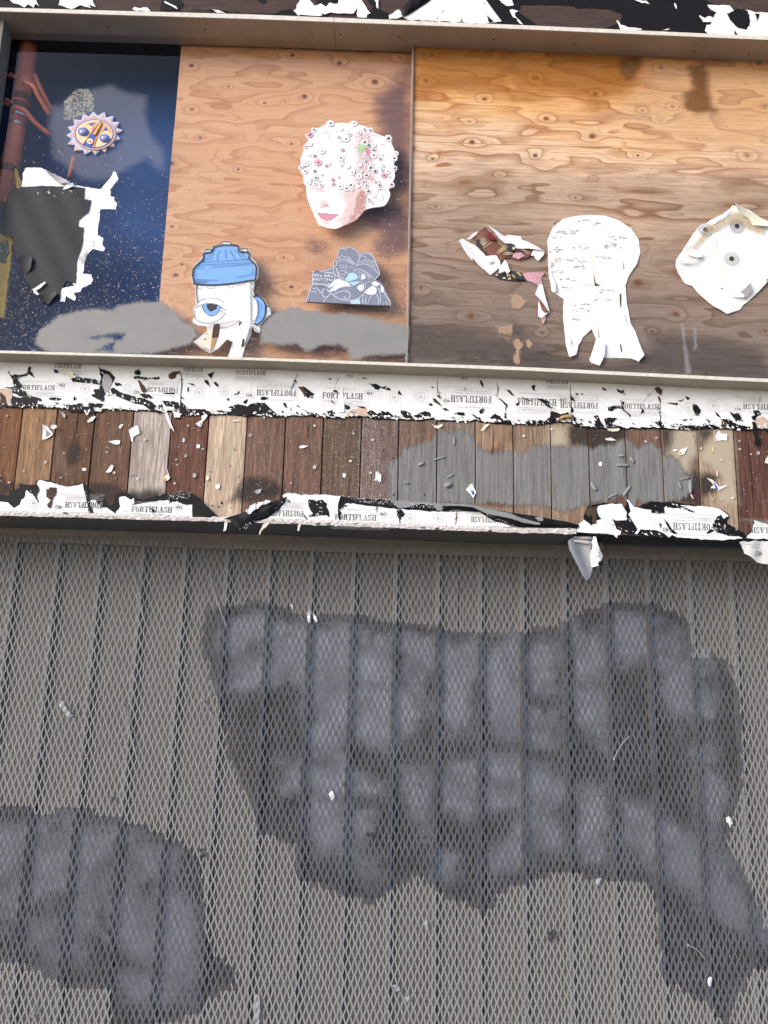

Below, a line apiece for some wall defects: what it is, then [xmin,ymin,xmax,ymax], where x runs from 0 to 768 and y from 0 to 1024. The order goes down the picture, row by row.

leakage [685,66,713,112]
peeling [0,376,39,406]
peeling [345,408,390,418]
peeling [755,412,768,428]